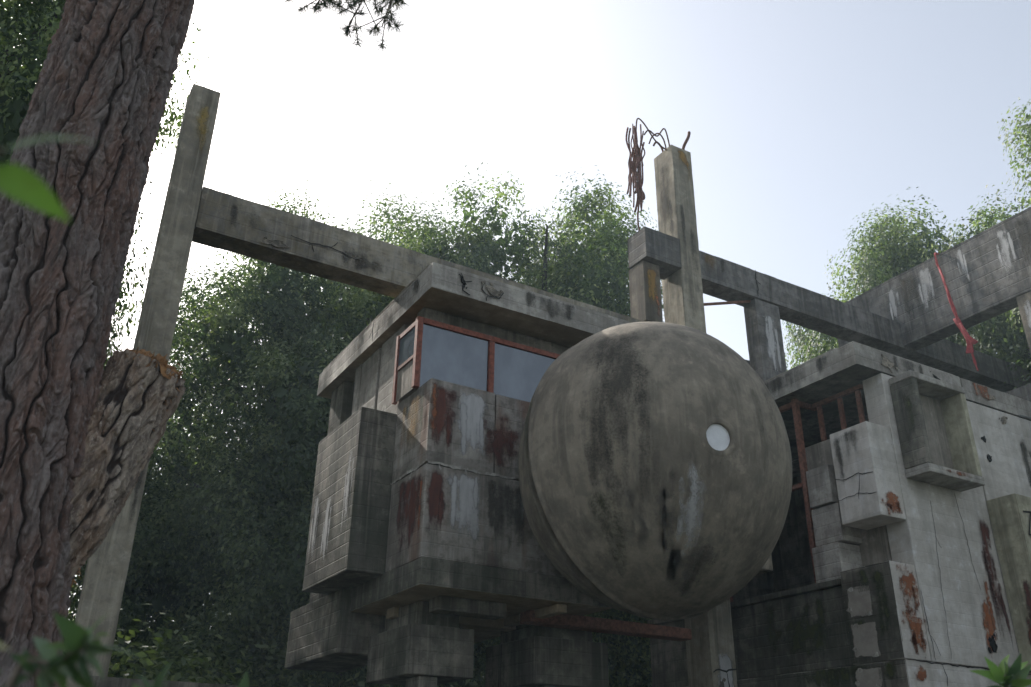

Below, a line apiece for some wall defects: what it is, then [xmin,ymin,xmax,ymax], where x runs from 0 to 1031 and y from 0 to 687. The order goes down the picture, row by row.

rust [625,124,645,231]
water stain [889,268,934,319]
water stain [957,250,970,280]
water stain [997,218,1031,267]
rust [430,383,456,447]
rust [483,417,518,466]
rust [397,471,445,551]
water stain [663,467,702,541]
rust [882,491,903,514]
rust [896,564,927,681]
rust [980,521,1012,650]
rust [1023,580,1031,645]